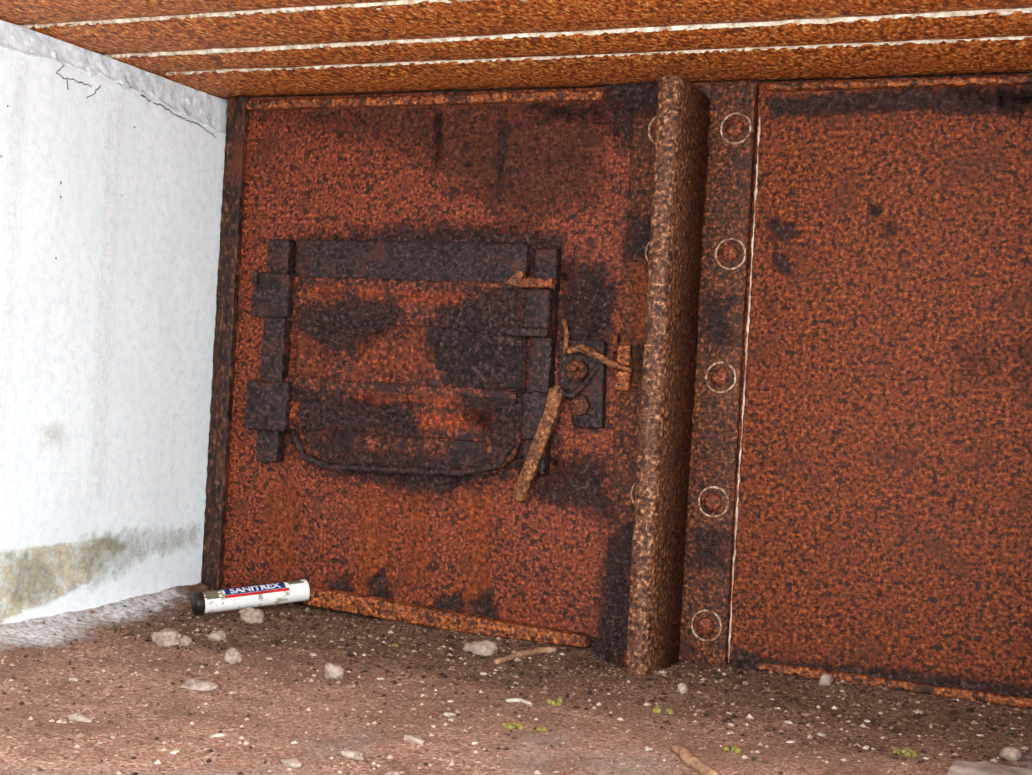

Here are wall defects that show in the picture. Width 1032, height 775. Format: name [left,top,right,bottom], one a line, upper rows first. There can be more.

rust [532,81,659,152]
rust [766,84,1032,117]
rust [622,211,651,259]
rust [766,219,797,275]
rust [294,221,615,358]
rust [294,286,528,430]
rust [331,440,524,500]
rust [532,423,633,668]
damp [0,539,180,648]
rust [366,567,390,599]
rust [433,587,497,618]
rust [732,646,1032,698]